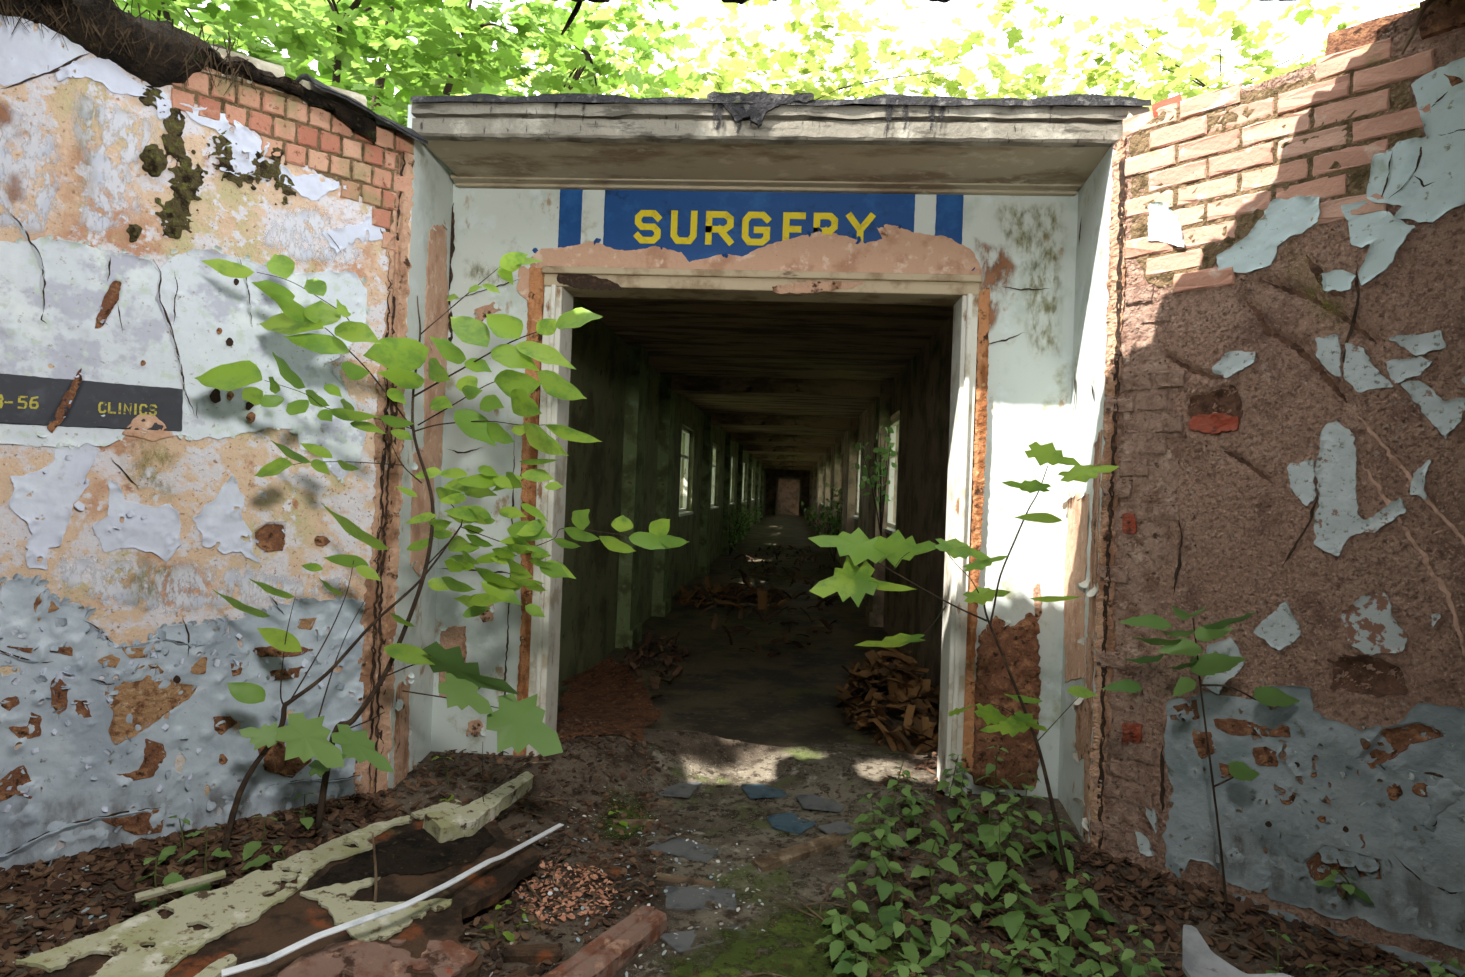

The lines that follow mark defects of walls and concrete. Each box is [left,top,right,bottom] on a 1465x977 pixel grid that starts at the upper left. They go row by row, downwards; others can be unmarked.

crack [1381,92,1465,197]
damp [983,244,1014,329]
crack [1342,261,1360,375]
peeling [0,15,451,940]
flaking render [1062,37,1465,977]
flaking render [970,583,1042,790]